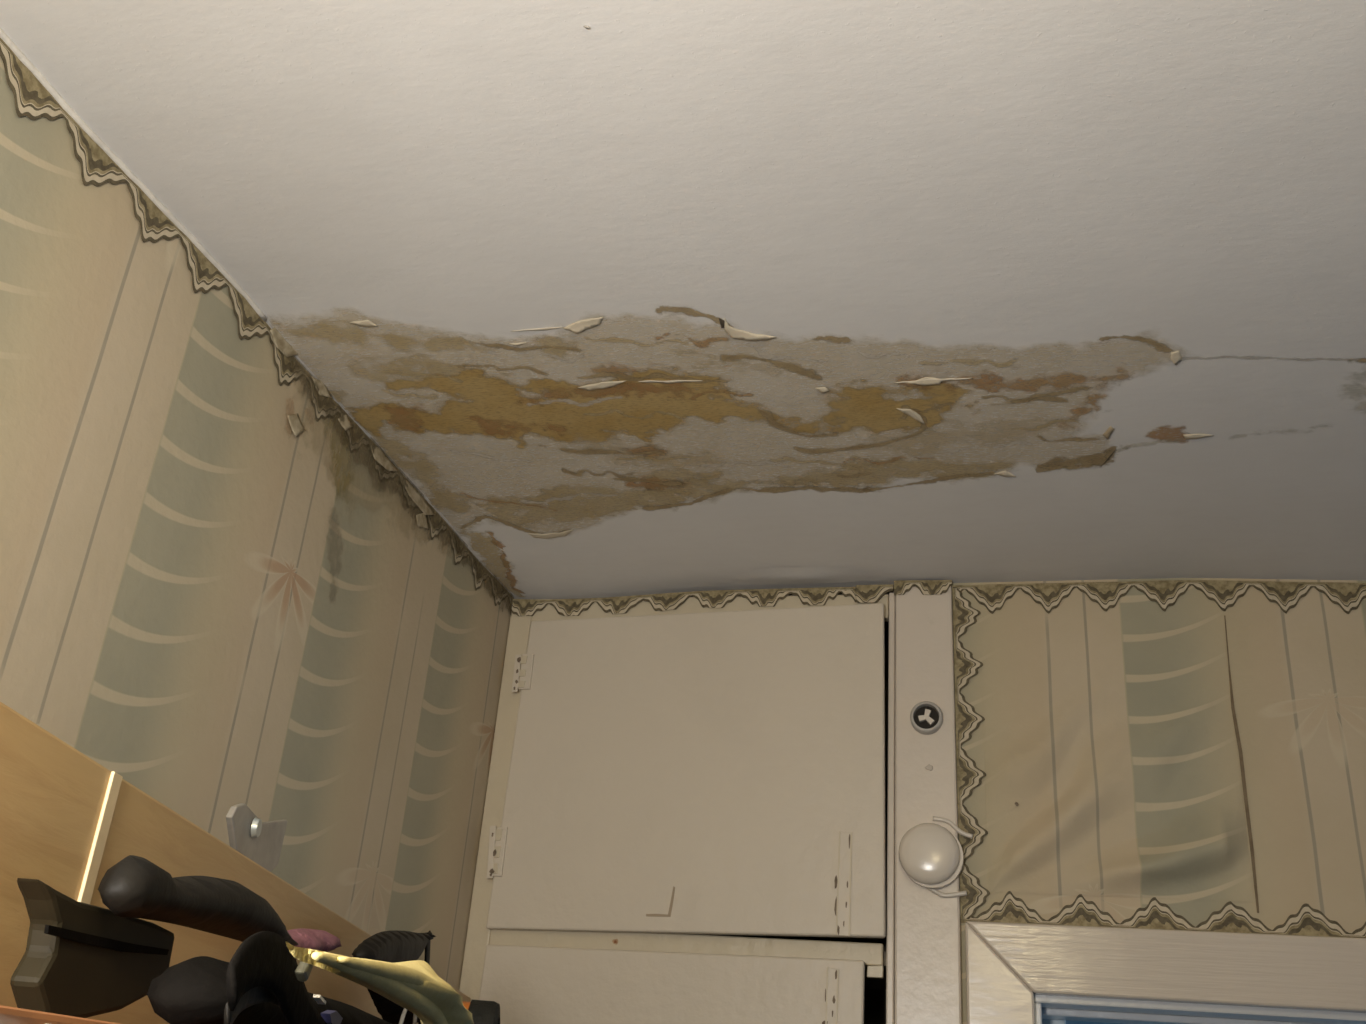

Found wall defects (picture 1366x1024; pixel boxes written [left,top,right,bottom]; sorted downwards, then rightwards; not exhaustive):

crack [1182,355,1366,363]